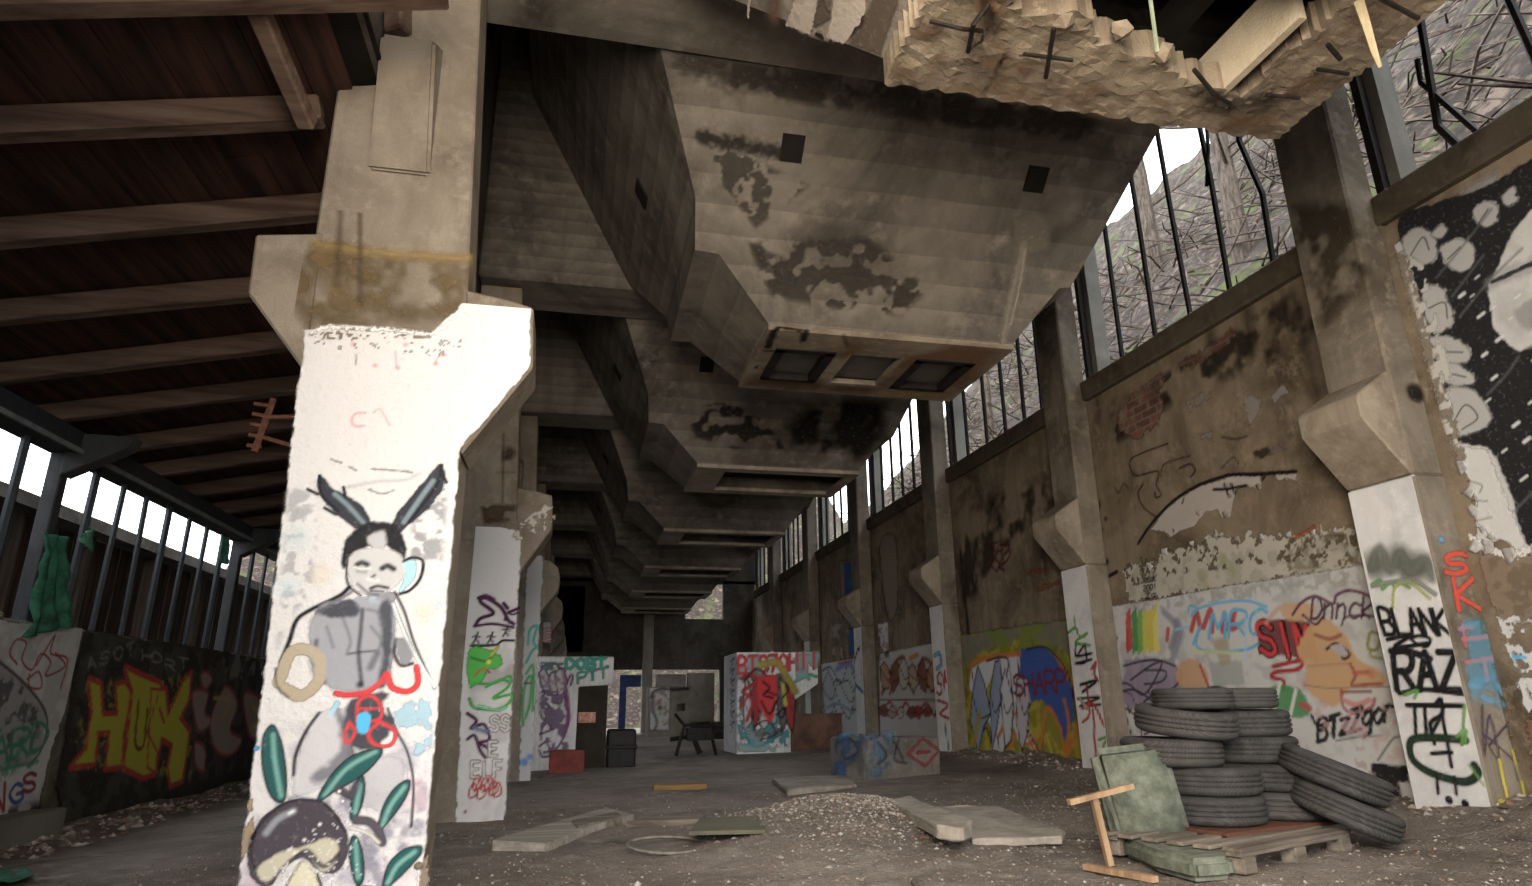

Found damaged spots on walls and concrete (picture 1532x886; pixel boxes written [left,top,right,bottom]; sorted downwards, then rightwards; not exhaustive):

leakage [680,53,1094,139]
spalling [916,0,1075,101]
spalling [1110,19,1134,41]
spalling [1153,42,1174,67]
spalling [1187,29,1350,132]
spalling [1368,0,1421,21]
leakage [696,130,781,225]
leakage [751,240,919,311]
leakage [692,403,783,449]
peeling [1122,444,1363,602]
peeling [1396,250,1532,769]